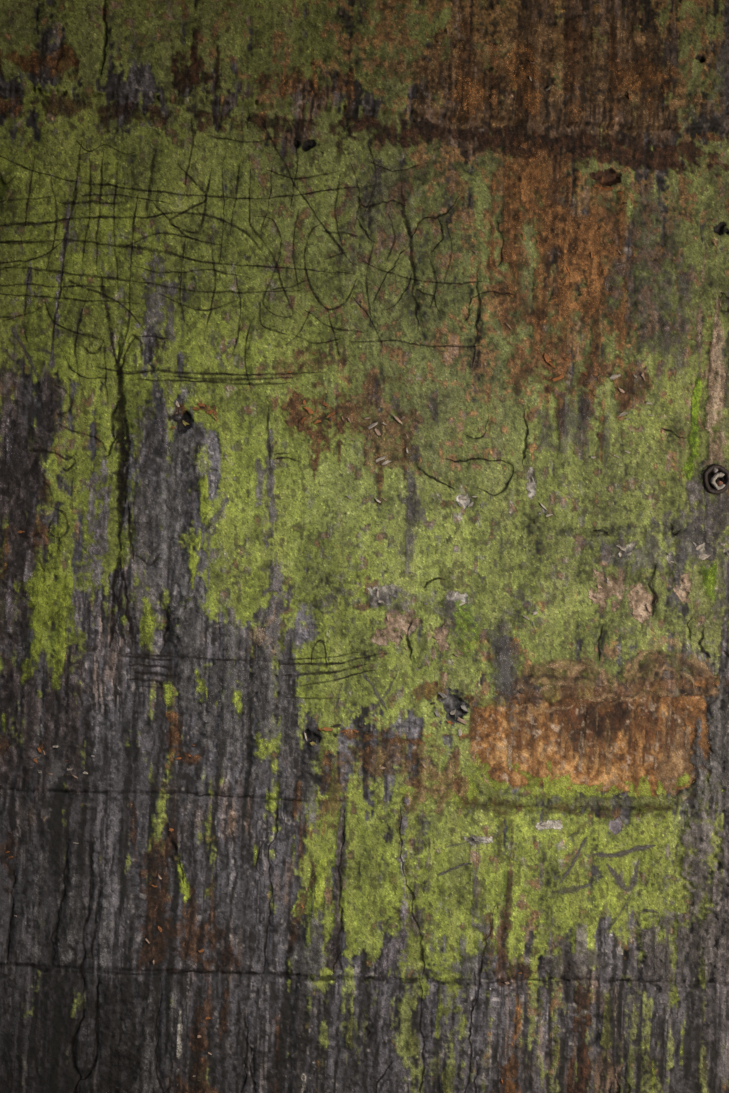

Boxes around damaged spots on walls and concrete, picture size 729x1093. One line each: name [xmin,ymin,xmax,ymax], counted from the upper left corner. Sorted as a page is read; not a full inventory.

rust [171,28,221,94]
rust [2,95,173,133]
rust [186,106,317,143]
rust [255,1,729,473]
spalling [168,400,216,433]
spalling [19,735,95,785]
rust [320,673,727,832]
rust [483,824,540,987]